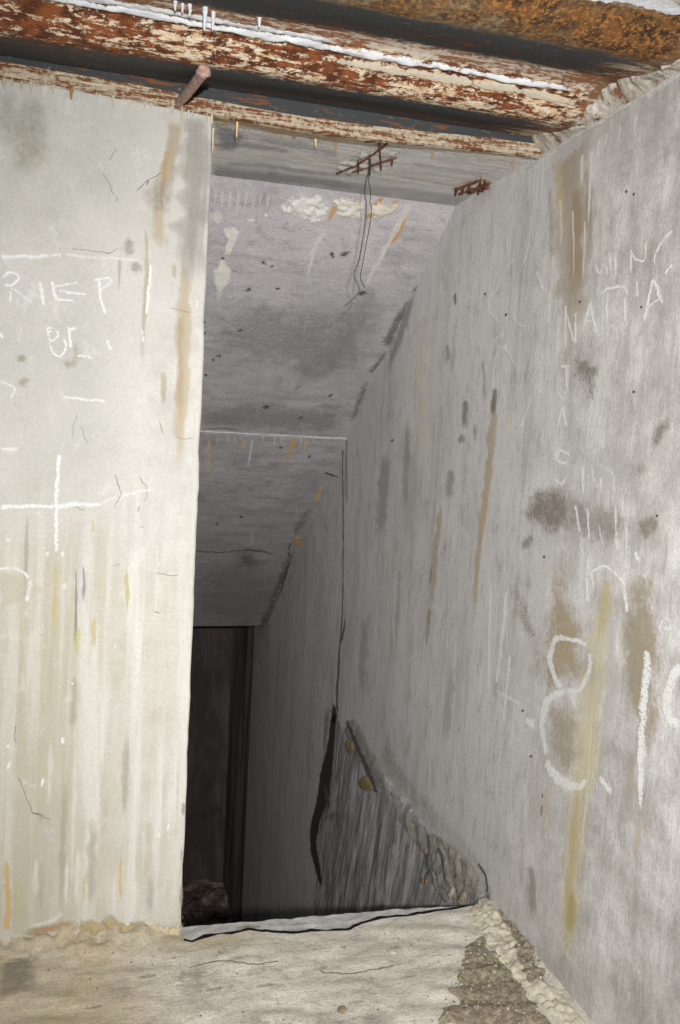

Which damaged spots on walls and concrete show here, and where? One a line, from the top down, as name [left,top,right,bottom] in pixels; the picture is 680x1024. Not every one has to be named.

rust [154,126,179,231]
leakage [184,132,410,297]
rust [176,271,190,443]
rust [474,390,496,595]
crack [310,441,378,885]
spalling [345,720,489,906]
crack [424,835,446,885]